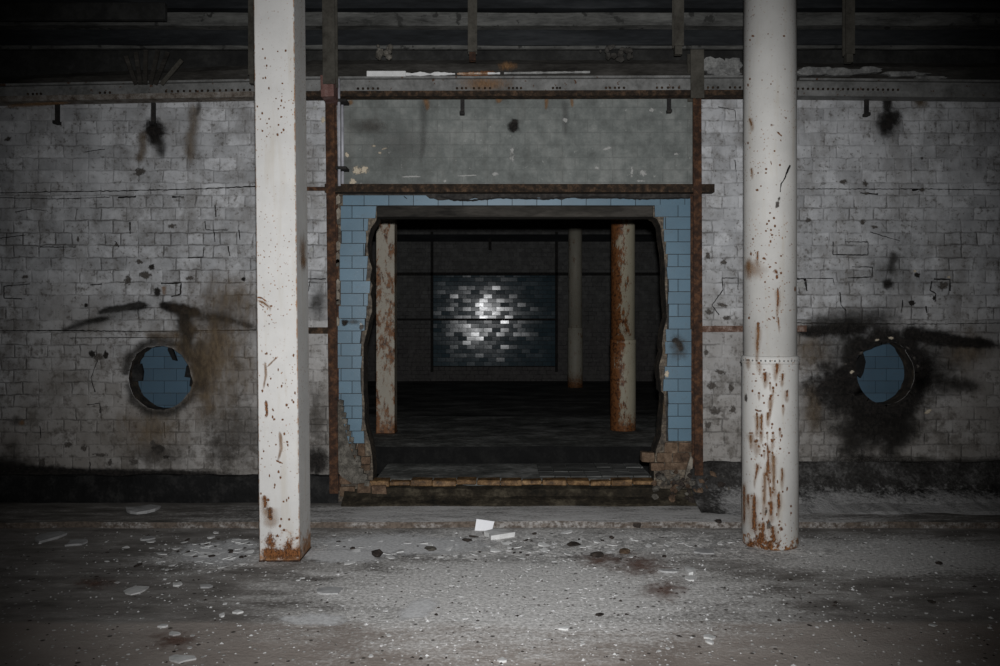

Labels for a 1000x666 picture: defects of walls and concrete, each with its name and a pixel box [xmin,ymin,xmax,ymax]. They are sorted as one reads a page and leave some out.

peeling [704,56,743,76]
peeling [797,66,947,79]
corrosion [743,251,792,549]
flaking render [338,399,387,497]
corrosion [260,493,300,560]